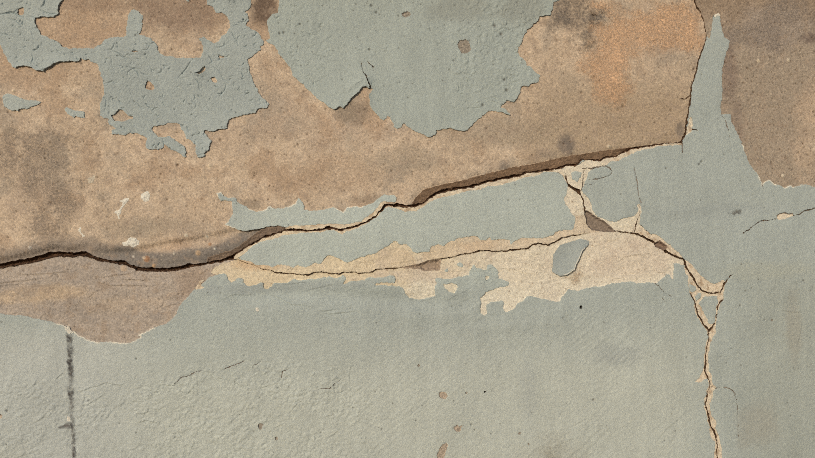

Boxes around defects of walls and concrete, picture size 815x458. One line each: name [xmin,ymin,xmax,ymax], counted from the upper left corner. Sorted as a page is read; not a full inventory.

flaking render [0,157,725,458]
crack [0,0,732,294]
peeling [0,0,815,269]
crack [690,293,723,458]
crack [743,208,815,234]